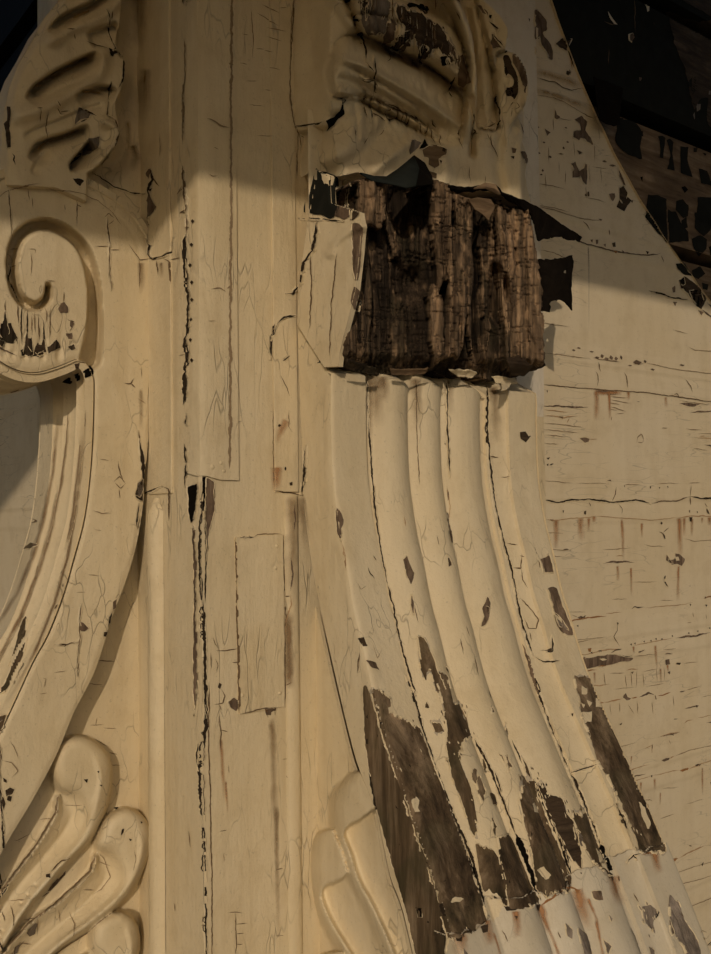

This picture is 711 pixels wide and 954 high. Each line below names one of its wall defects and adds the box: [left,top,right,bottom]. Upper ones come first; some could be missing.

peeling [409,139,448,179]
peeling [538,109,593,196]
peeling [645,136,711,256]
crack [3,0,505,487]
peeling [304,168,364,312]
peeling [21,302,76,357]
crack [546,479,711,522]
peeling [0,616,28,694]
peeling [357,636,382,672]
peeling [363,635,613,954]
peeling [573,648,695,856]
peeling [631,893,701,954]